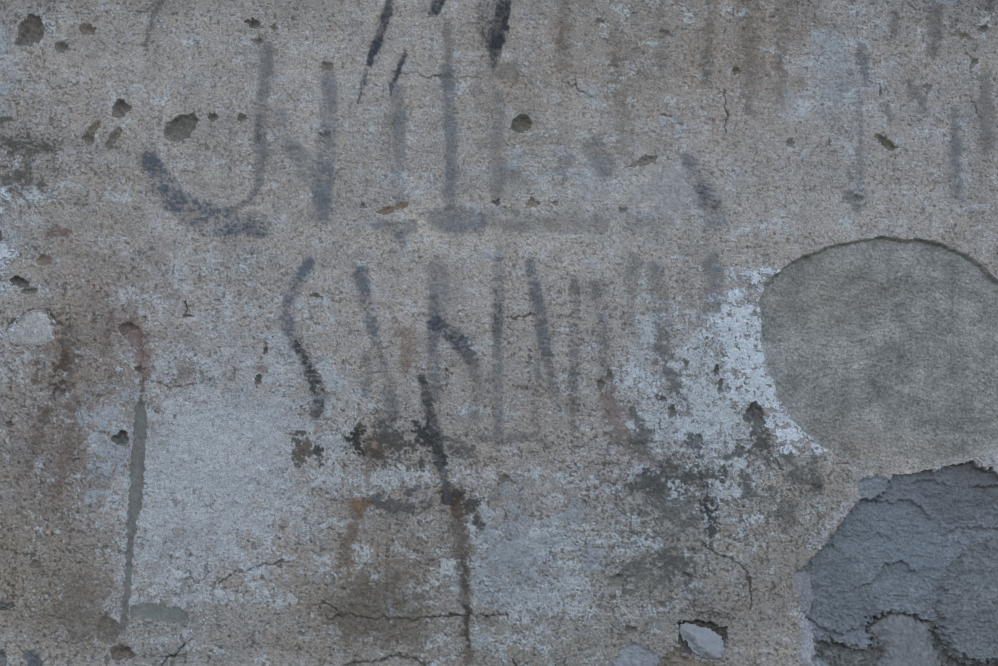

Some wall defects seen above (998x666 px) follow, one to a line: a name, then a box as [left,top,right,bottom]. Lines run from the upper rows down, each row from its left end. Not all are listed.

crack [353,652,426,666]
spalling [793,448,998,666]